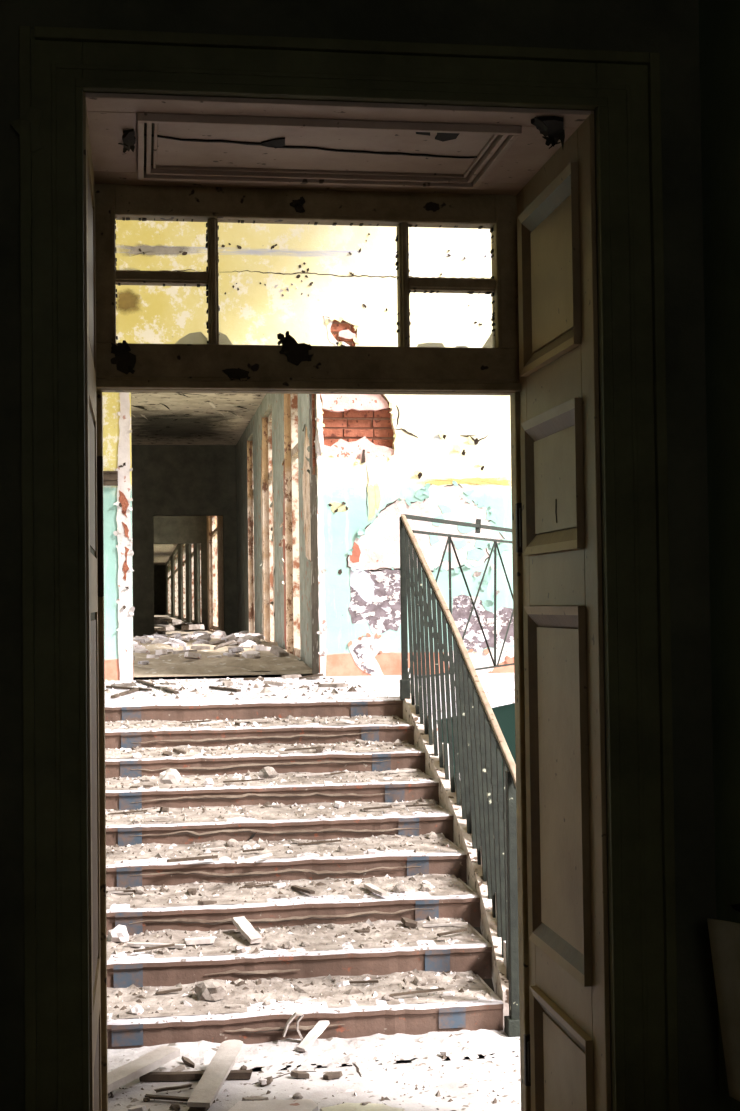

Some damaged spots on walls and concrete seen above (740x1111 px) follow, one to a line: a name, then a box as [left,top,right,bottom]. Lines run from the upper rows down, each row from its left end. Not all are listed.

crack [144,134,477,159]
peeling [531,116,565,149]
crack [233,270,486,279]
flaking render [323,316,360,346]
flaking render [113,392,190,681]
peeling [301,394,514,677]